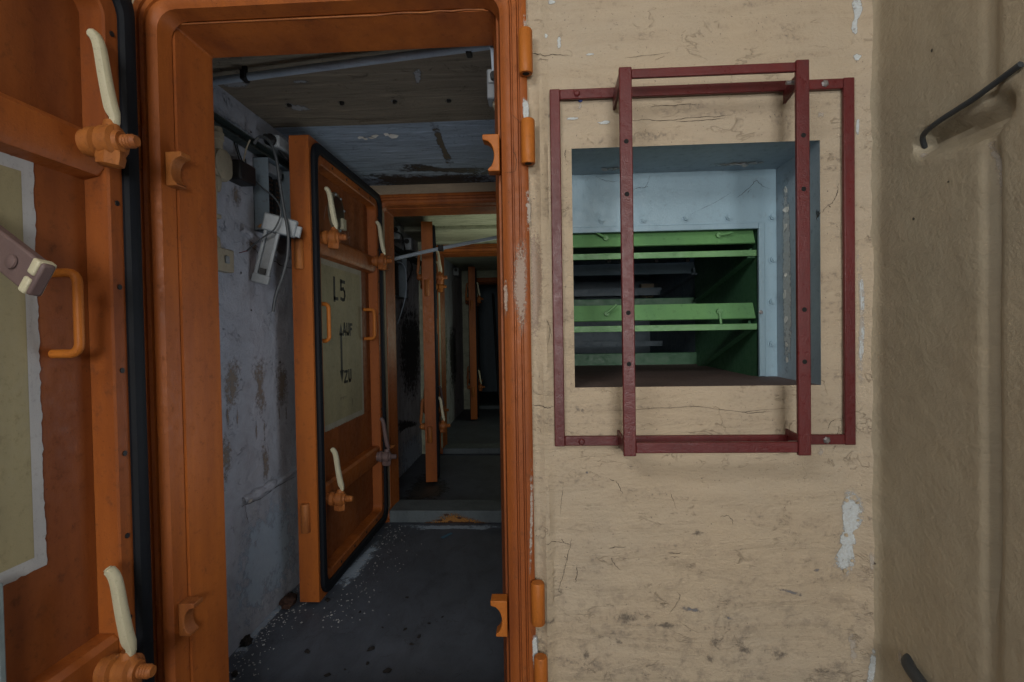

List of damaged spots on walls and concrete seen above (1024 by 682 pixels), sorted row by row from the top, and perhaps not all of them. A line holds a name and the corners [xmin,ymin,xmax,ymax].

peeling [851,0,863,34]
leakage [363,128,496,186]
peeling [835,492,862,573]